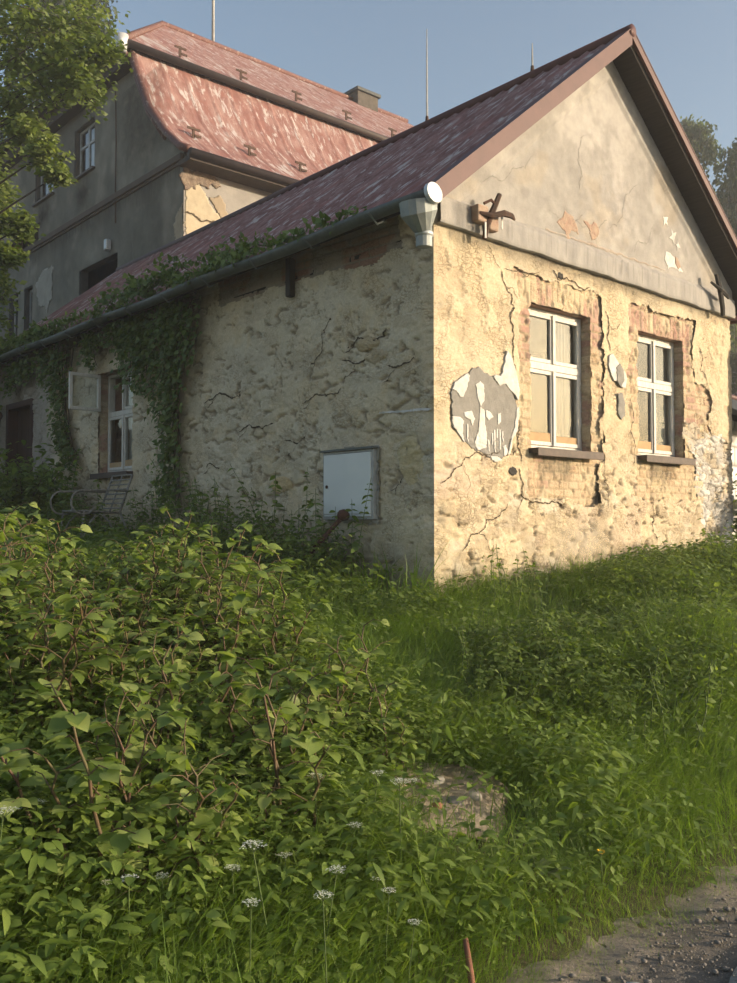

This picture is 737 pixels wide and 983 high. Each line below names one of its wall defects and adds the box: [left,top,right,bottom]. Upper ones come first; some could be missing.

flaking render [173,167,228,240]
flaking render [546,210,683,272]
flaking render [35,265,54,313]
crack [488,245,590,368]
crack [304,318,414,409]
flaking render [450,266,734,545]
crack [440,398,567,554]